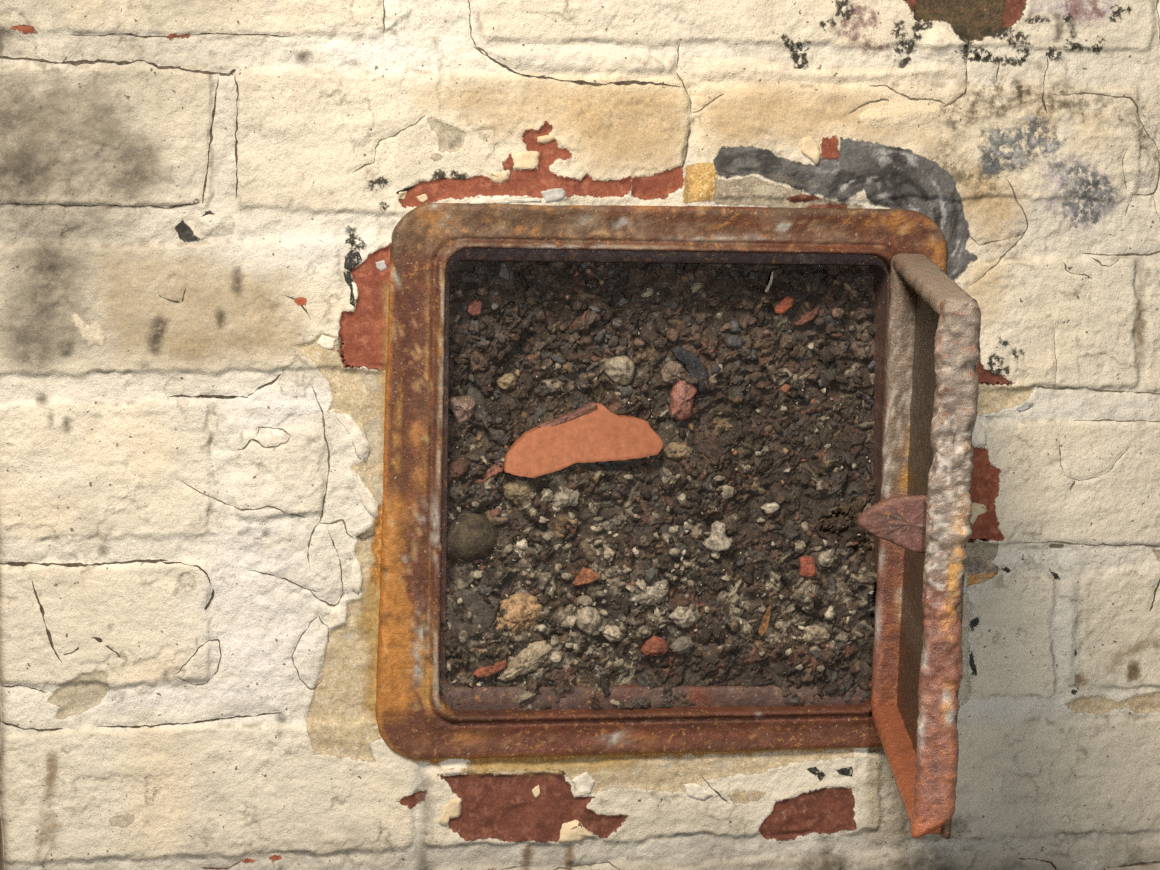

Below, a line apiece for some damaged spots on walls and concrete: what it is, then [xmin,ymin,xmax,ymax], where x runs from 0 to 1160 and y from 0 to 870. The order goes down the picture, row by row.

crack [468,0,723,167]
mould [781,34,821,70]
mould [892,17,932,68]
mould [955,15,1049,66]
peeling [396,116,864,208]
crack [170,374,281,399]
crack [172,385,355,690]
peeling [291,243,391,763]
peeling [967,359,1035,573]
crack [0,559,214,662]
corrosion [360,504,383,714]
peeling [432,748,857,843]